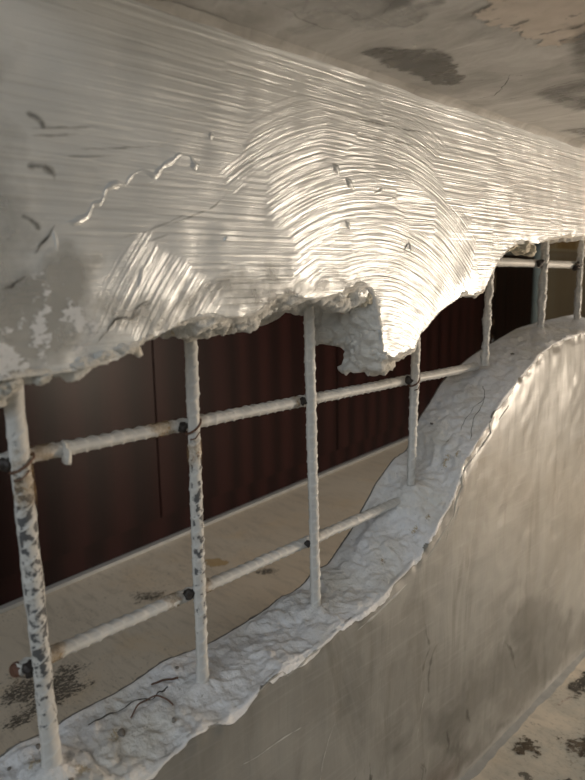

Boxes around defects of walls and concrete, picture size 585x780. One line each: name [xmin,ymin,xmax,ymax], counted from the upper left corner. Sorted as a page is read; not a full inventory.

water stain [364,48,464,86]
peeling [0,264,144,408]